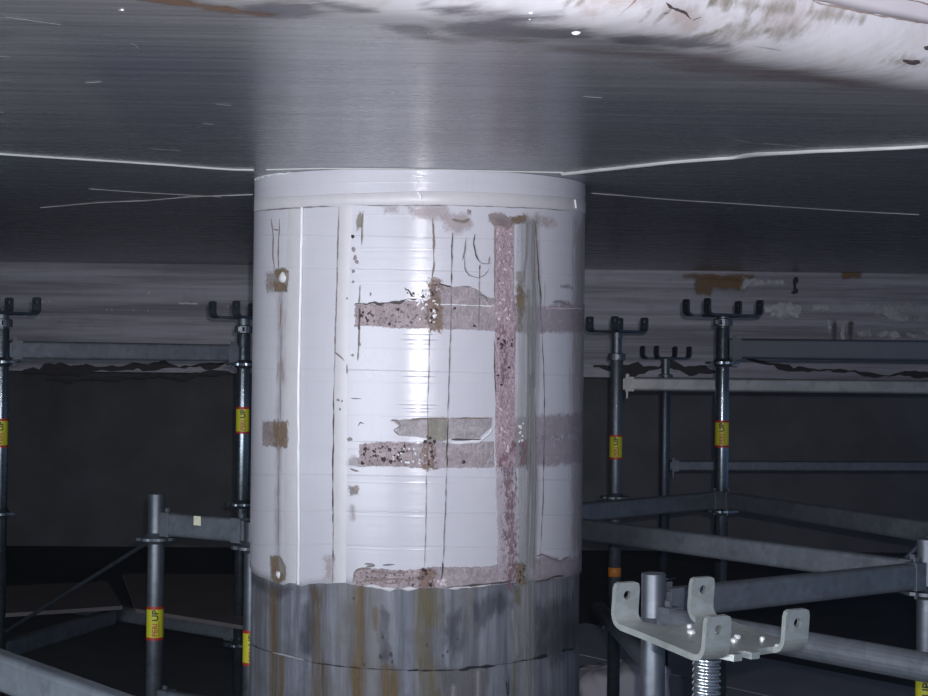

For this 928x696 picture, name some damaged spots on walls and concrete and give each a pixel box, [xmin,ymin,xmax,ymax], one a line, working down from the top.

crack [664,3,701,21]
spalling [346,213,585,592]
corrosion [353,586,364,696]
crack [306,648,575,696]